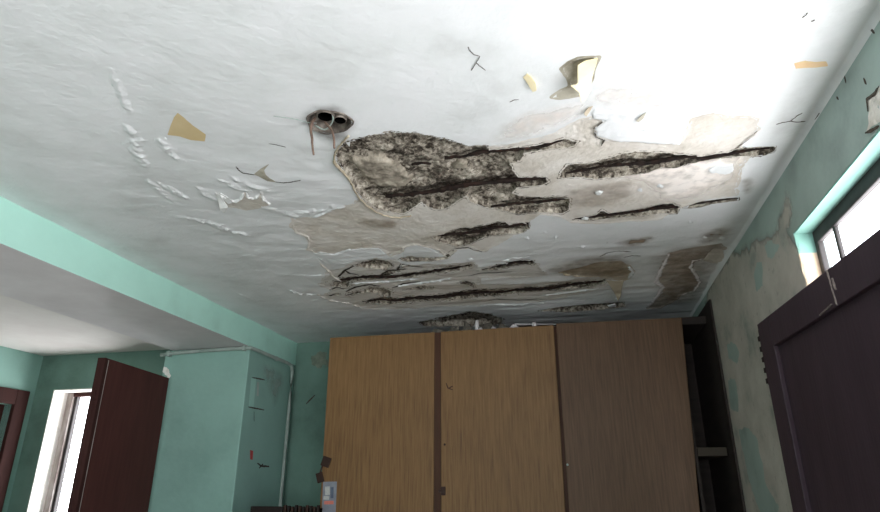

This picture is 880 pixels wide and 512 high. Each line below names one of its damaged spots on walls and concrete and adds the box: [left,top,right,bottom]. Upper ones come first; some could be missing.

peeling [794,61,828,69]
peeling [865,86,880,134]
peeling [168,113,206,141]
peeling [254,164,275,182]
peeling [215,191,271,213]
peeling [289,55,777,327]